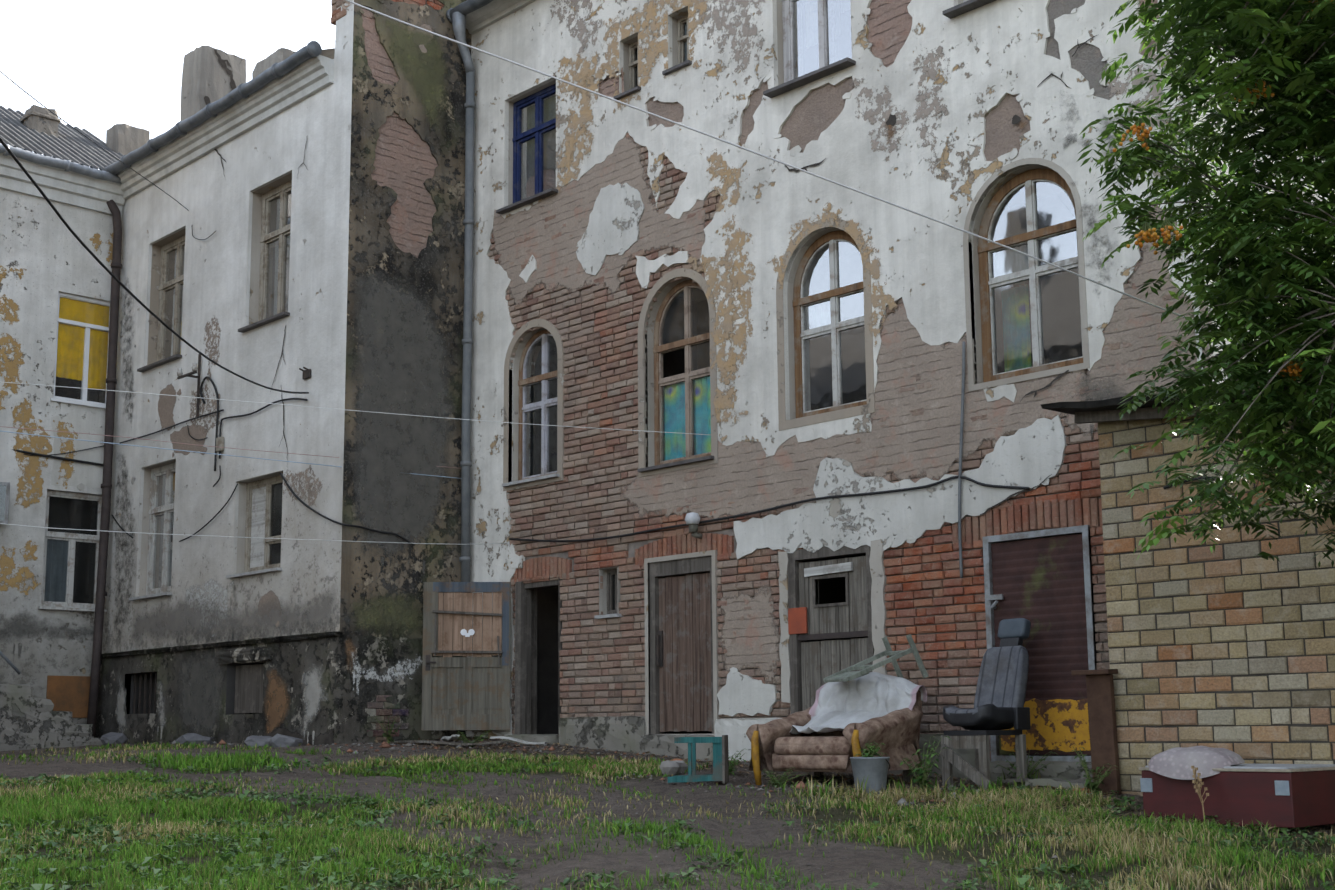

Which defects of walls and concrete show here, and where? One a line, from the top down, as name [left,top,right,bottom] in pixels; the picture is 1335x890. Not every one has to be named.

water stain [388,21,444,127]
flaking render [370,112,438,258]
peeling [0,265,79,508]
water stain [355,274,453,566]
flaking render [488,0,1214,734]
water stain [114,457,331,641]
water stain [116,680,126,734]
water stain [157,655,224,739]
water stain [303,669,322,745]
water stain [351,652,422,700]